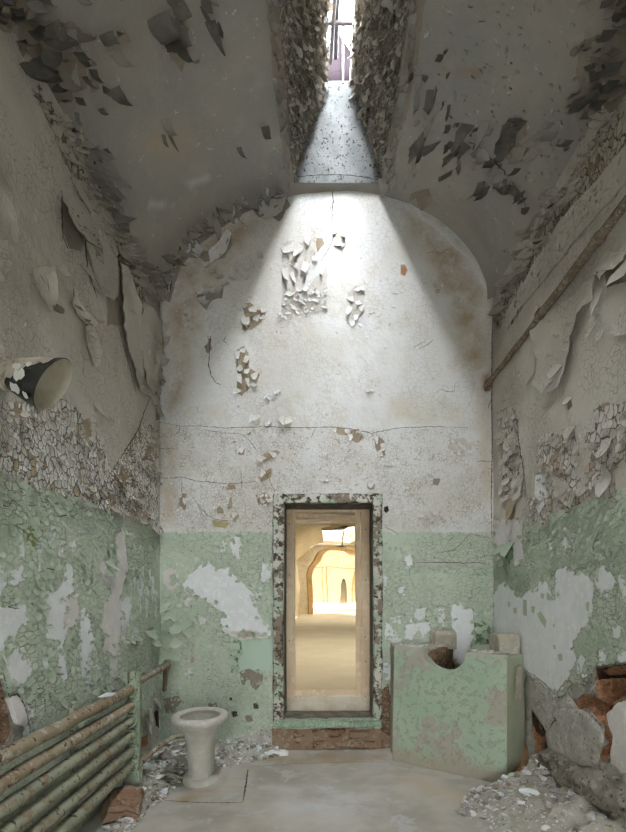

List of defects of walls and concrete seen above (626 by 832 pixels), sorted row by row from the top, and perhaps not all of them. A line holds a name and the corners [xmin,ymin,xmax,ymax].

peeling [0,0,333,752]
peeling [276,223,354,334]
peeling [338,271,388,327]
flaking render [348,0,626,396]
peeling [491,399,626,568]
peeling [382,552,626,823]